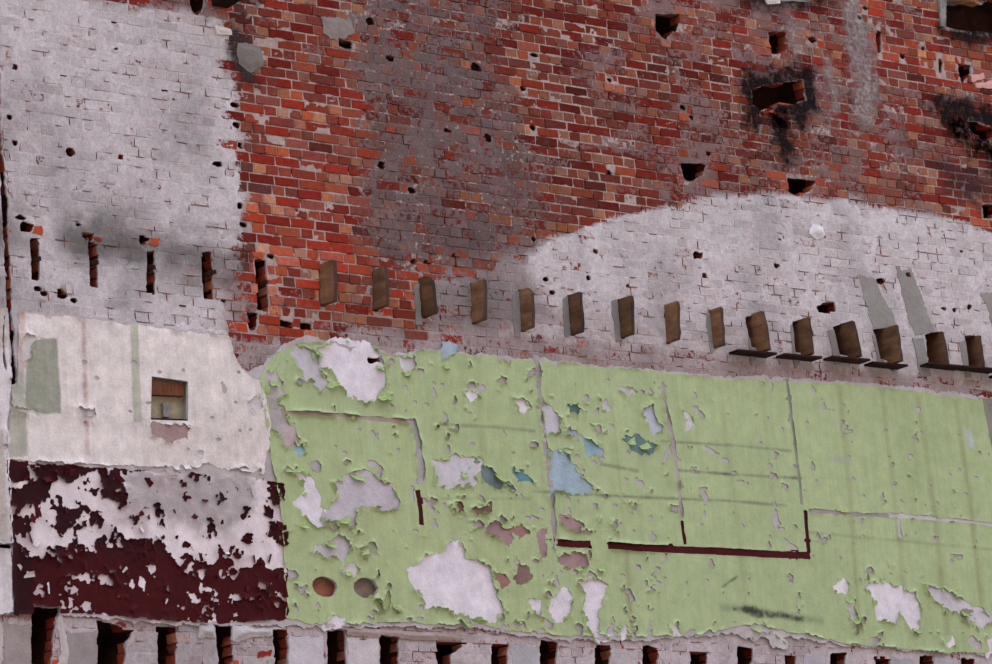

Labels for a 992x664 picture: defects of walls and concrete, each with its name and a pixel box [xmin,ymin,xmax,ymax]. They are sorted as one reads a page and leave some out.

spalling [946,1,992,33]
damp [768,108,798,166]
spalling [787,178,807,195]
damp [949,117,992,176]
crack [0,141,16,385]
peeling [290,323,391,408]
peeling [247,363,401,577]
peeling [431,453,534,490]
peeling [11,462,287,627]
peeling [406,539,533,628]
peeling [454,501,653,644]
peeling [866,578,992,659]